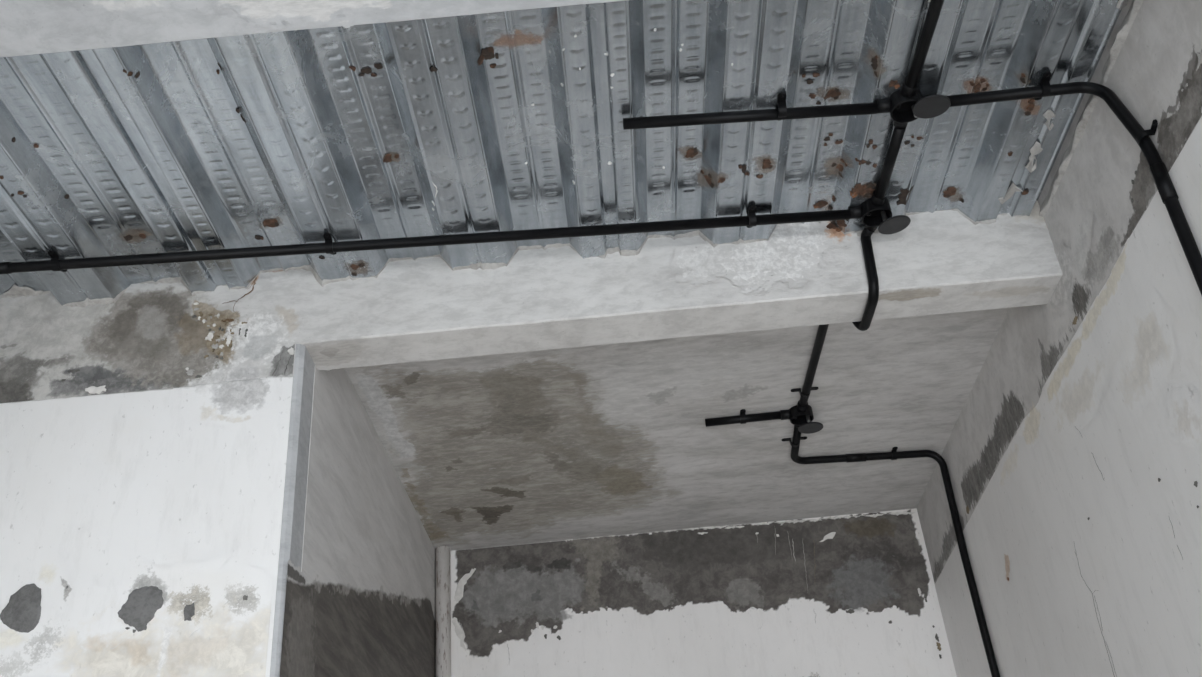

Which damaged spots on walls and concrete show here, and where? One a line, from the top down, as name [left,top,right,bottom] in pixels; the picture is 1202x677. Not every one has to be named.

rust [478,30,542,68]
rust [802,73,849,105]
leakage [1154,35,1202,172]
rust [679,146,726,188]
rust [738,157,775,179]
rust [814,195,858,249]
rust [824,133,877,198]
rust [943,187,964,203]
spalling [186,296,248,360]
leakage [0,147,1202,677]
peeling [452,568,476,651]
crack [1074,543,1117,677]